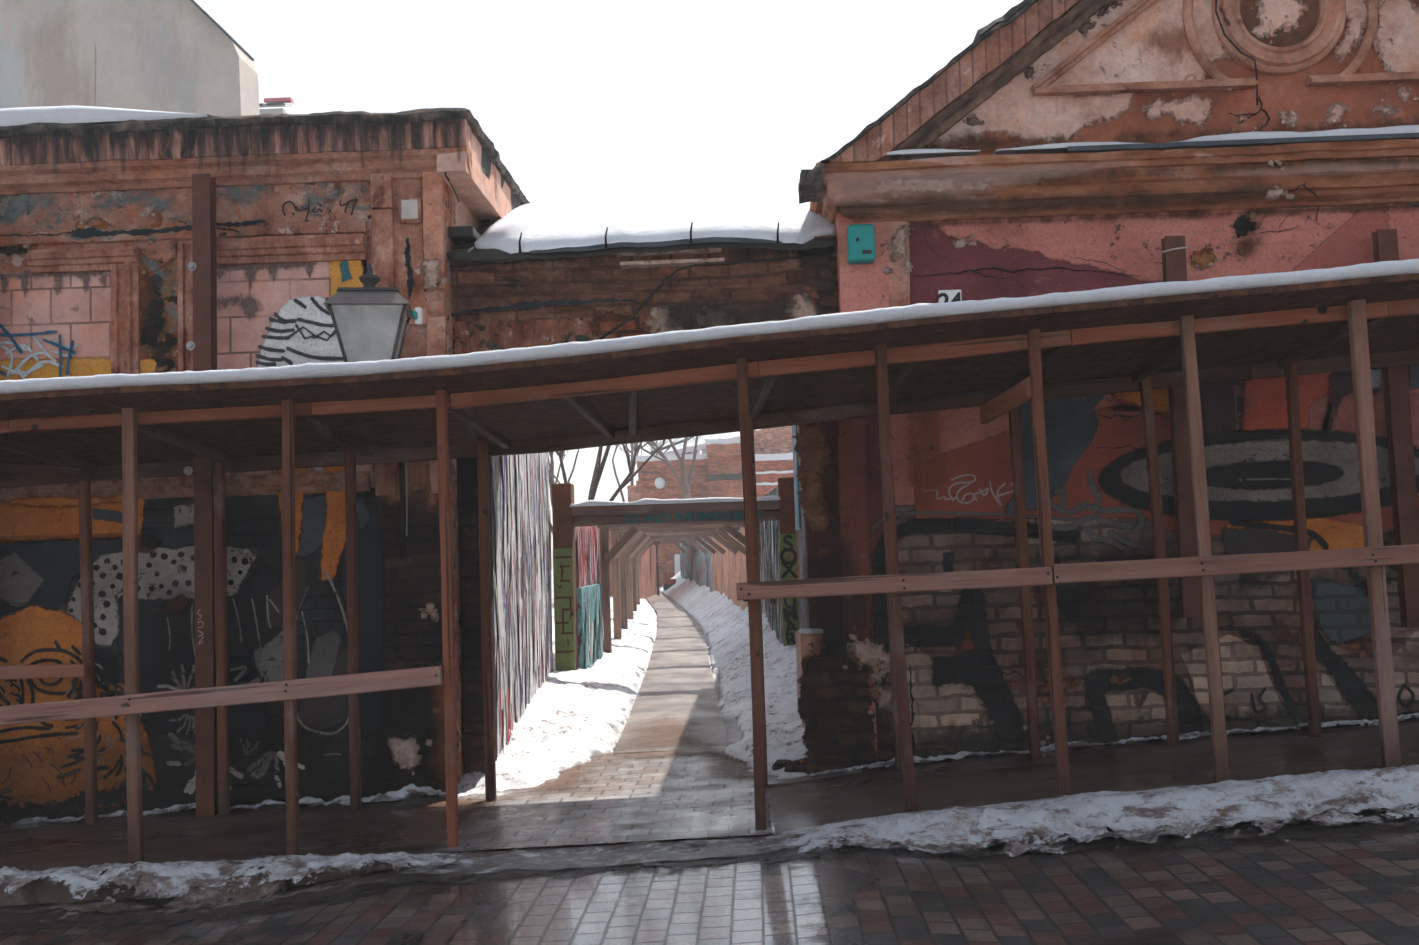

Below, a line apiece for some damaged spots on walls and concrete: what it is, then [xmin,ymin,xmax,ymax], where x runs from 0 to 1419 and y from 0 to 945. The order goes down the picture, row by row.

flaking render [1251,0,1309,45]
spalling [1023,65,1036,80]
spalling [963,113,985,126]
flaking render [1142,74,1212,130]
spalling [71,215,116,231]
spalling [1230,211,1262,238]
crack [913,228,1162,279]
spalling [140,269,178,373]
flaking render [386,707,461,775]